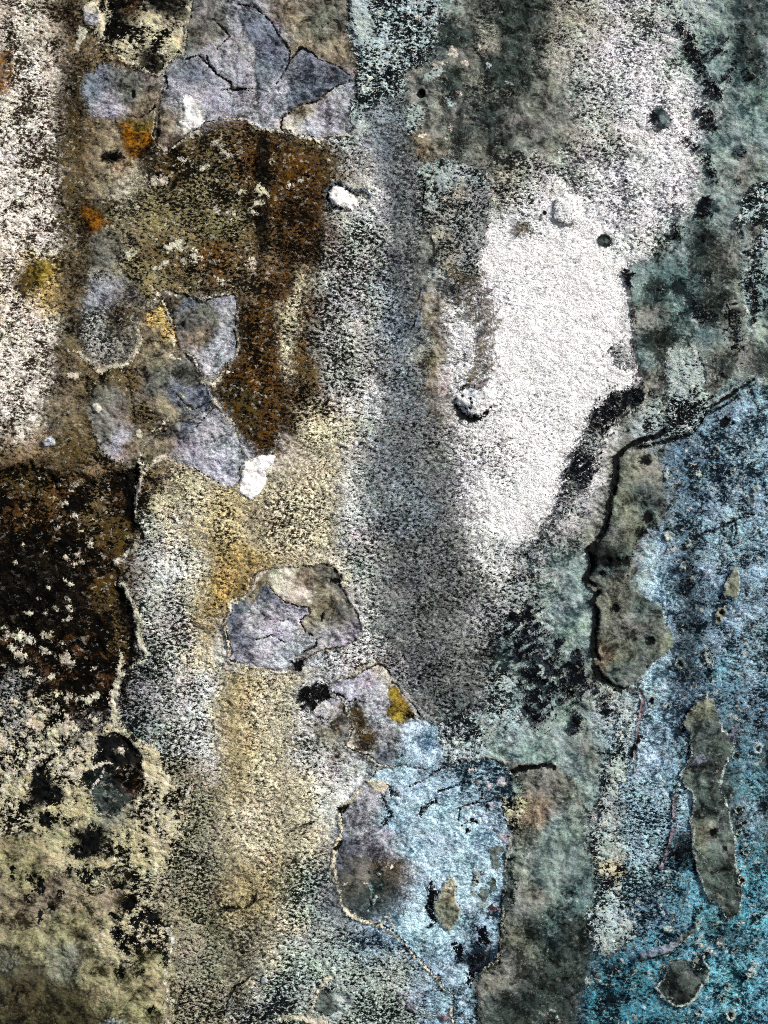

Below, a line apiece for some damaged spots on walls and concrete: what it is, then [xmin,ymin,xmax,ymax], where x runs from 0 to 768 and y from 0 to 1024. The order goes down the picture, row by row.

corrosion [66,117,342,462]
crack [633,360,755,450]
crack [690,512,763,540]
spalling [222,553,364,677]